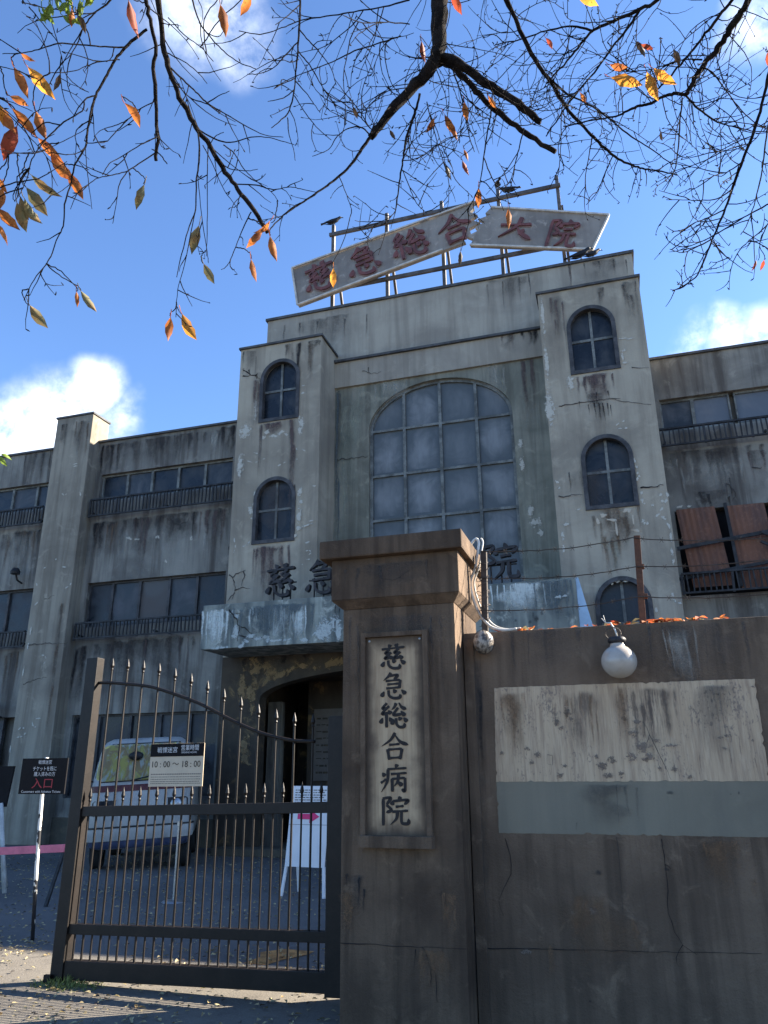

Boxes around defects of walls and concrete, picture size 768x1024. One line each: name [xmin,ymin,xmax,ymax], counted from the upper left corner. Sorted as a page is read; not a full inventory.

crack [559,398,651,407]
peeling [527,507,543,537]
peeling [596,458,692,563]
crack [229,570,262,641]
peeling [212,610,343,649]
peeling [237,656,343,716]
crack [603,839,762,962]